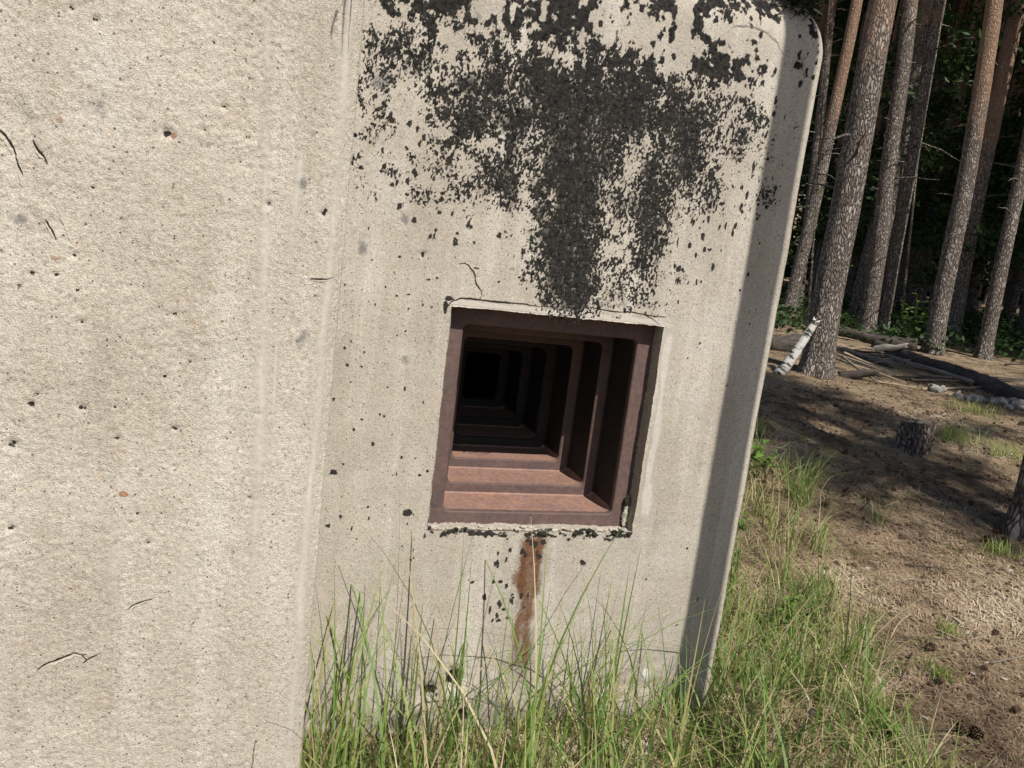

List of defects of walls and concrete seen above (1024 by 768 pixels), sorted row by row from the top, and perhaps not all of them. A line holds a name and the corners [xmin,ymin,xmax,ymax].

crack [0,130,48,174]
damp [528,0,709,325]
crack [45,219,56,239]
crack [444,263,555,310]
rust [514,538,543,668]
crack [37,652,98,670]